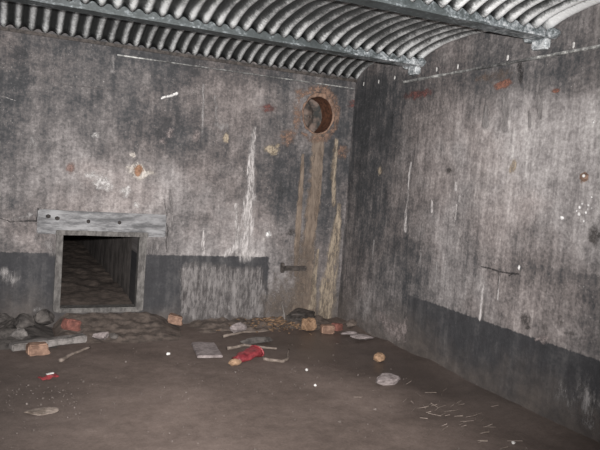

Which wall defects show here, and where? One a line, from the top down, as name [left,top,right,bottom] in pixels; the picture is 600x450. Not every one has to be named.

efflorescence [223,128,256,260]
corrosion [280,85,346,319]